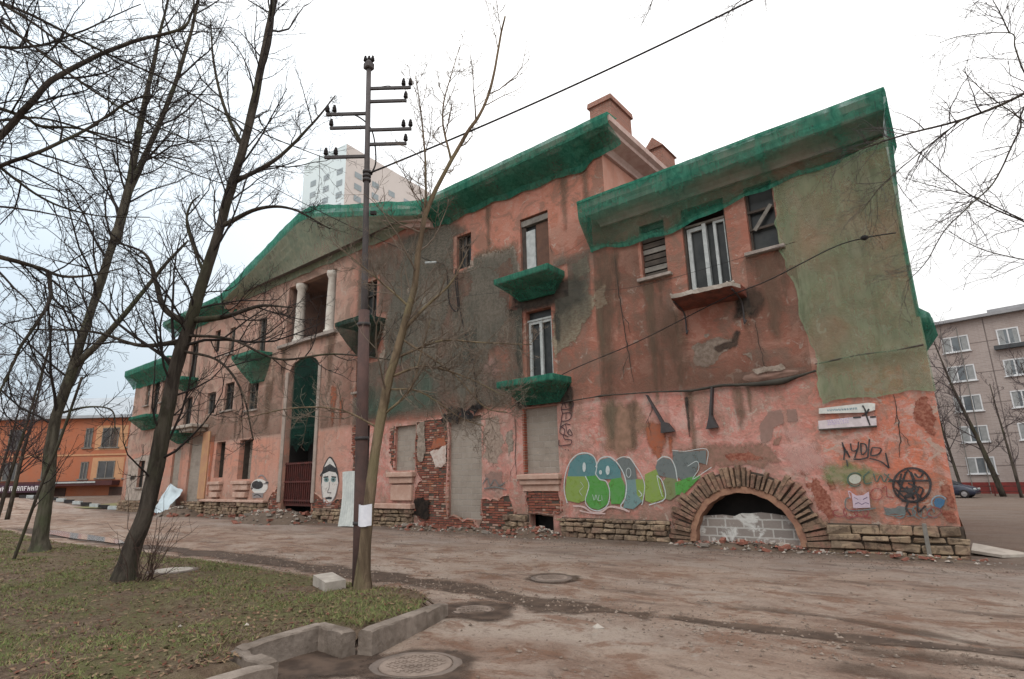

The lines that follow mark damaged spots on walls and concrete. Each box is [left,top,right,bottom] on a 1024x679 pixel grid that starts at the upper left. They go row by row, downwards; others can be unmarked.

peeling [379,226,452,469]
peeling [691,331,752,367]
corrosion [645,423,672,459]
crack [893,395,910,457]
spalling [913,396,936,436]
flaking render [412,416,563,533]
spalling [798,469,836,523]